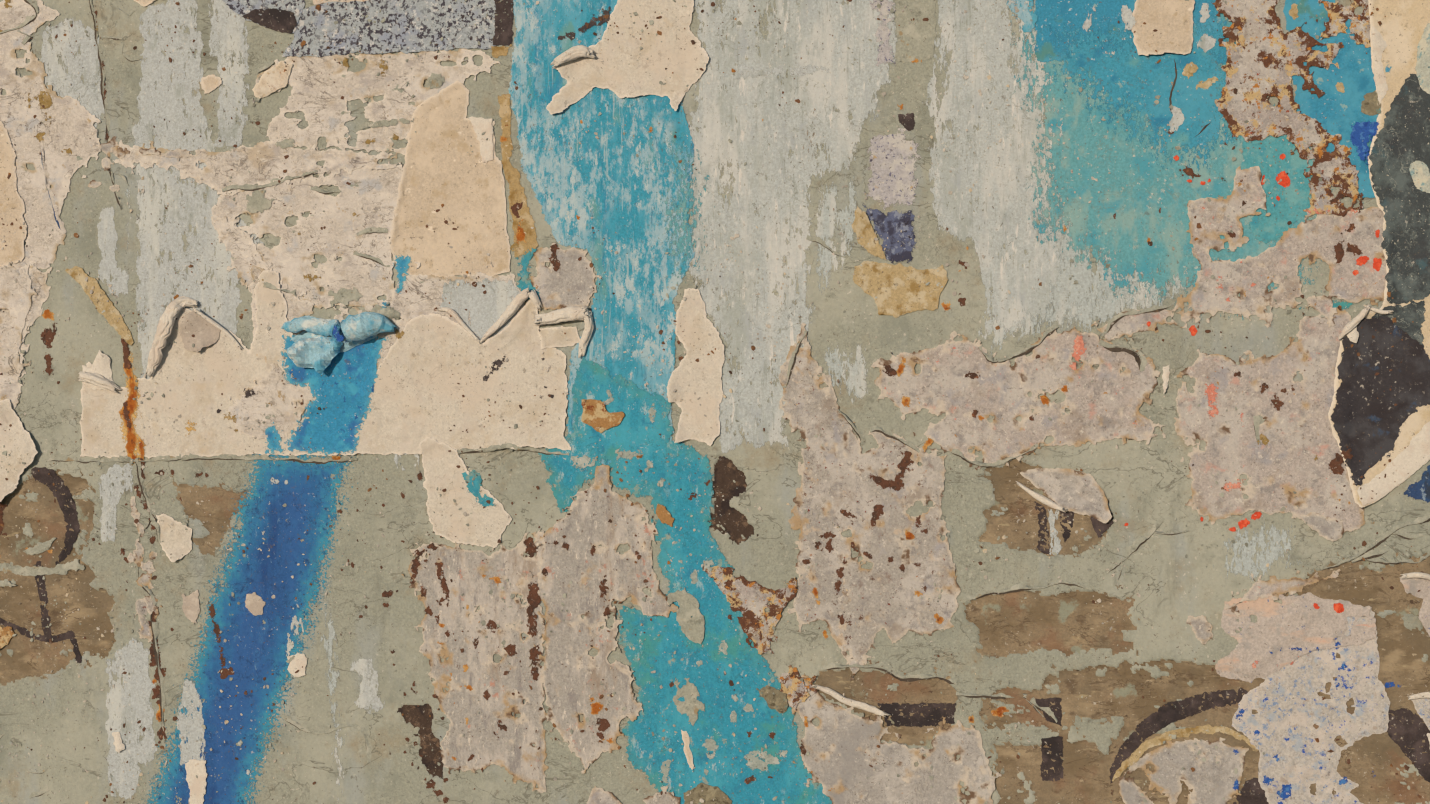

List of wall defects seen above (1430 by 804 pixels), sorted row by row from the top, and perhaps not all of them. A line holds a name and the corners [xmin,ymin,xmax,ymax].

rust [581,8,662,40]
rust [1327,193,1363,263]
rust [119,311,174,591]
peeling [730,0,1430,804]
peeling [397,448,759,804]